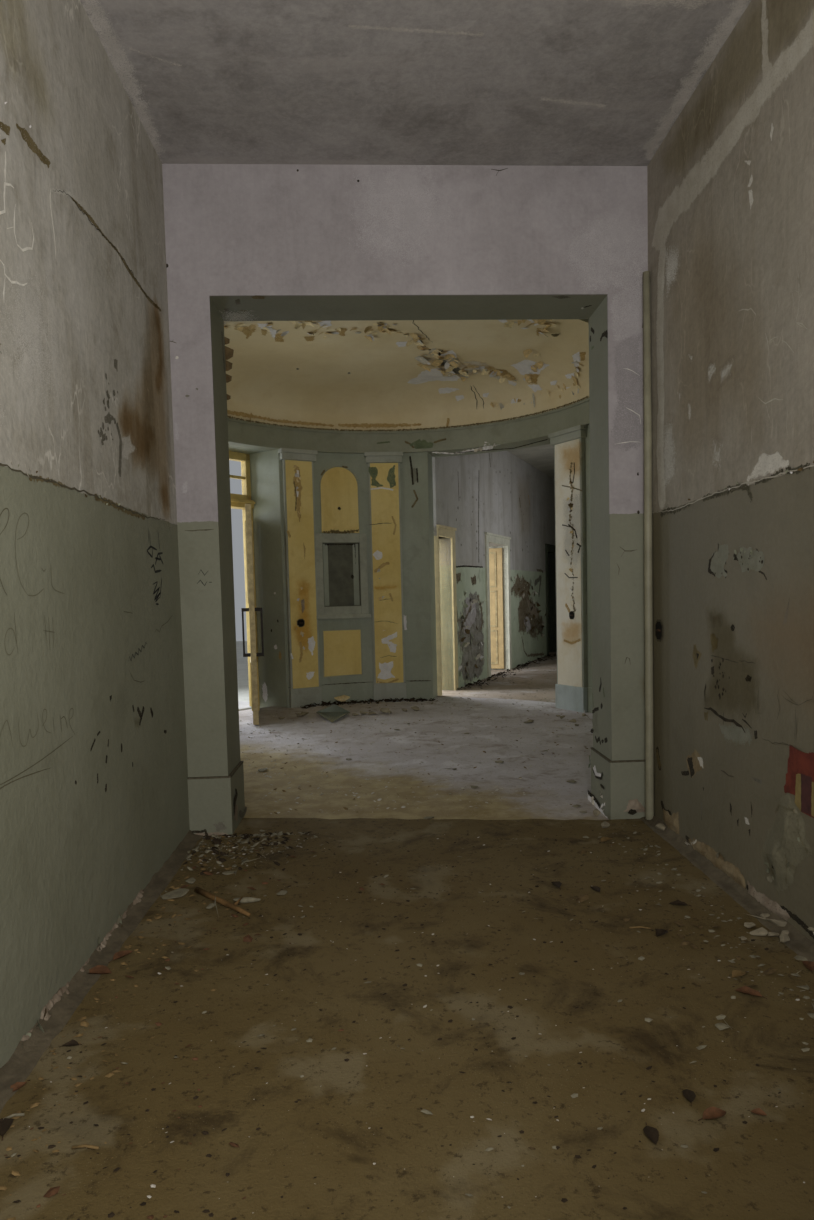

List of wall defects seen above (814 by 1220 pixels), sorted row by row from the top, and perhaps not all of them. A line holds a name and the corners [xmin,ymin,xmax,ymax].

crack [0,152,56,300]
peeling [0,122,161,311]
peeling [219,295,608,410]
damp [116,422,137,477]
peeling [322,529,359,579]
peeling [368,438,548,508]
peeling [562,462,584,619]
peeling [637,461,814,518]
peeling [377,615,407,683]
peeling [456,565,487,685]
peeling [511,569,547,657]
spalling [661,801,814,939]